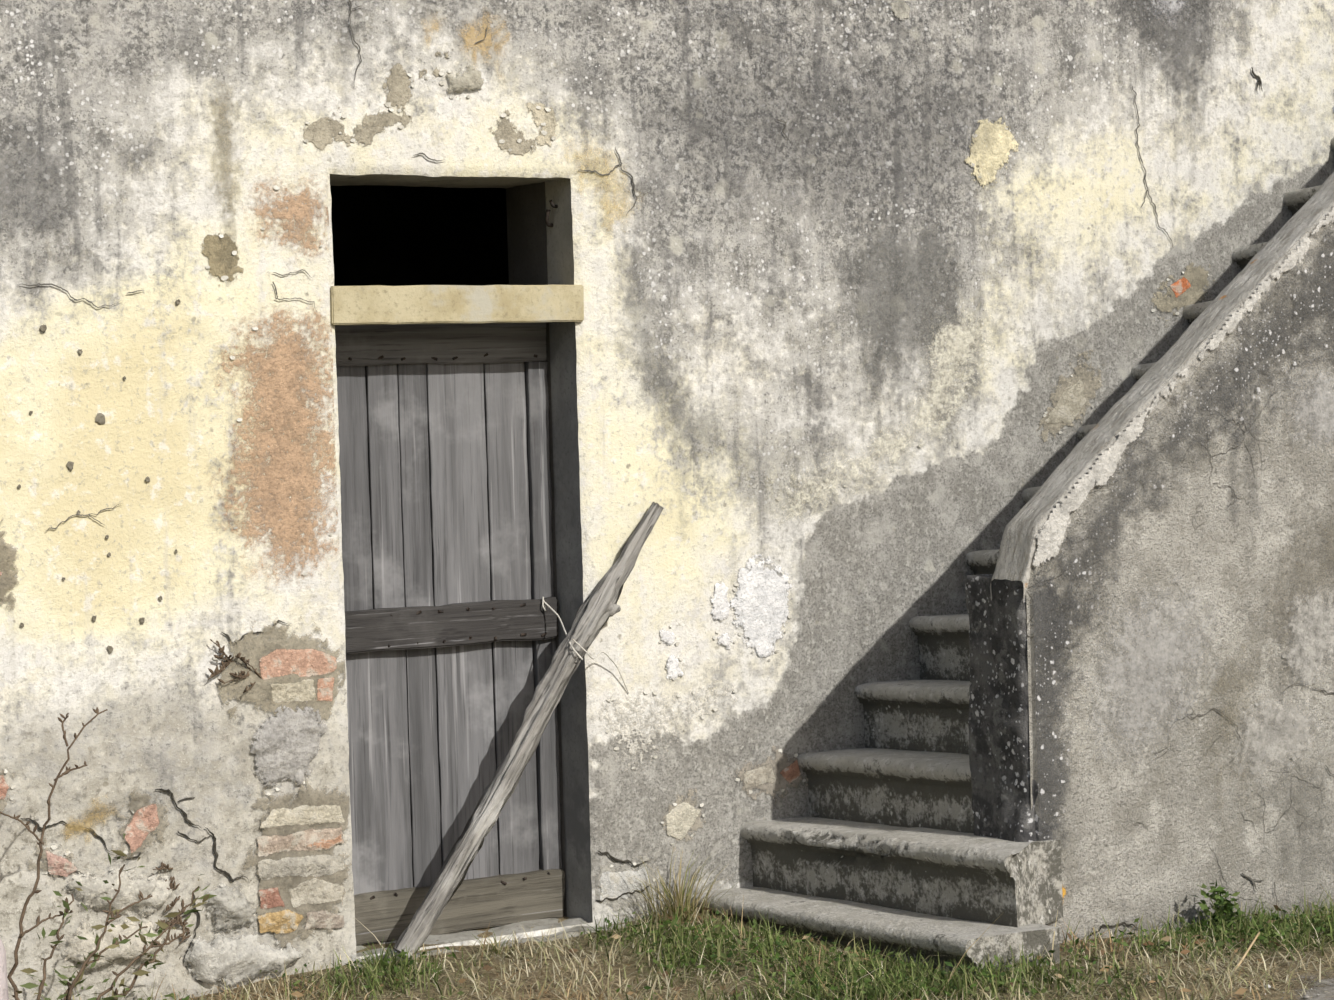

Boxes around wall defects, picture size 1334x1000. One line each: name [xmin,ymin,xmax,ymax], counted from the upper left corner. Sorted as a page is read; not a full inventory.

leakage [1152,0,1184,23]
peeling [303,51,450,150]
crack [1132,86,1173,247]
peeling [202,233,243,286]
peeling [1032,207,1334,567]
peeling [218,310,338,580]
spalling [212,616,346,719]
crack [1283,651,1334,694]
crack [21,818,141,875]
crack [155,788,249,882]
spalling [243,780,352,949]
crack [182,895,226,982]